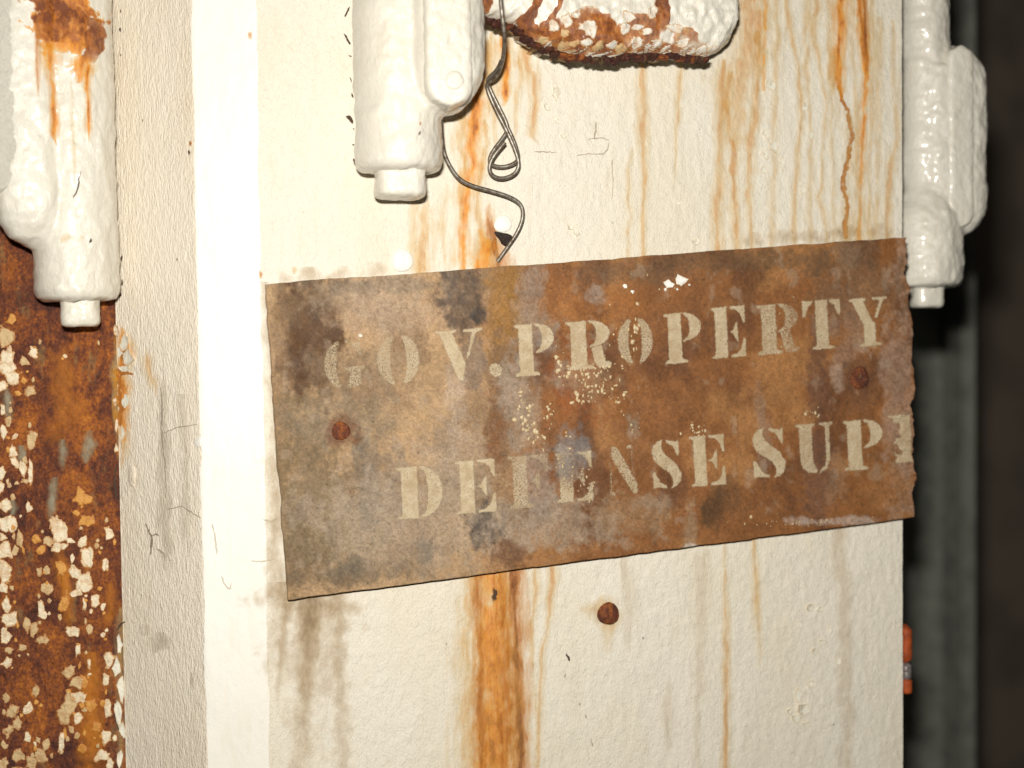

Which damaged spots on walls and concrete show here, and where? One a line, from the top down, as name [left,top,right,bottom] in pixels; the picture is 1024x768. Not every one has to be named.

rust [834,0,869,184]
rust [459,79,504,270]
peeling [112,394,130,452]
rust [116,331,129,442]
peeling [113,325,135,372]
peeling [0,313,126,768]
rust [81,652,103,768]
water stain [299,595,322,658]
rust [473,569,528,768]